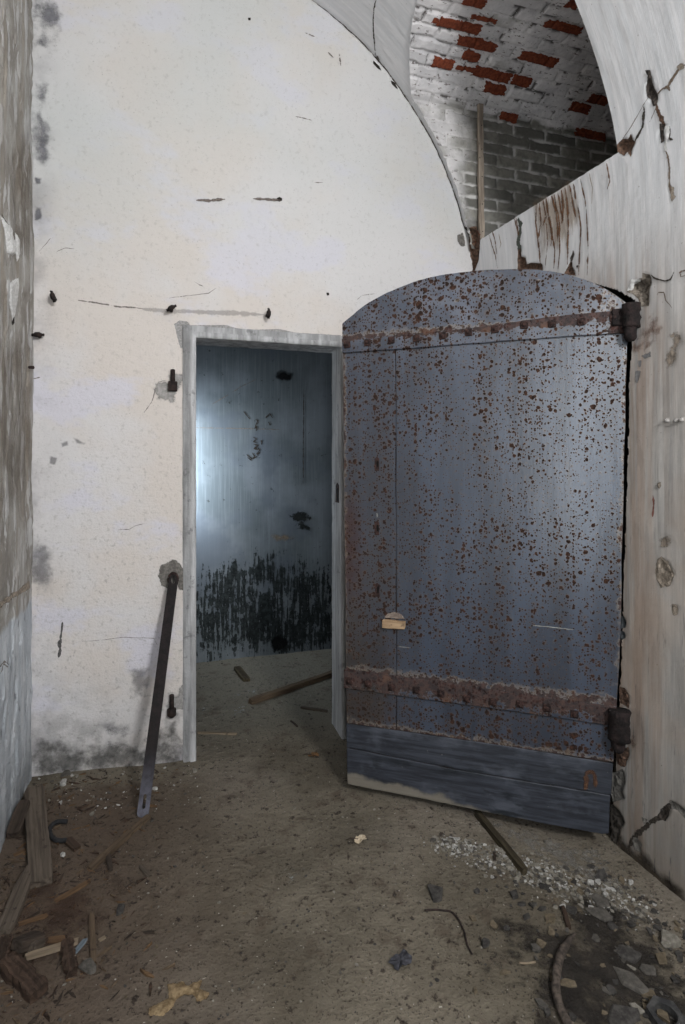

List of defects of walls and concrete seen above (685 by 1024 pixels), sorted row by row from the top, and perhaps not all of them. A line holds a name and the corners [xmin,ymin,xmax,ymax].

leakage [35,5,59,23]
leakage [36,115,48,160]
crack [623,63,685,201]
corrosion [535,174,593,273]
spalling [627,273,652,306]
spalling [655,537,674,588]
leakage [196,547,332,662]
leakage [34,728,178,774]
crack [627,800,685,853]